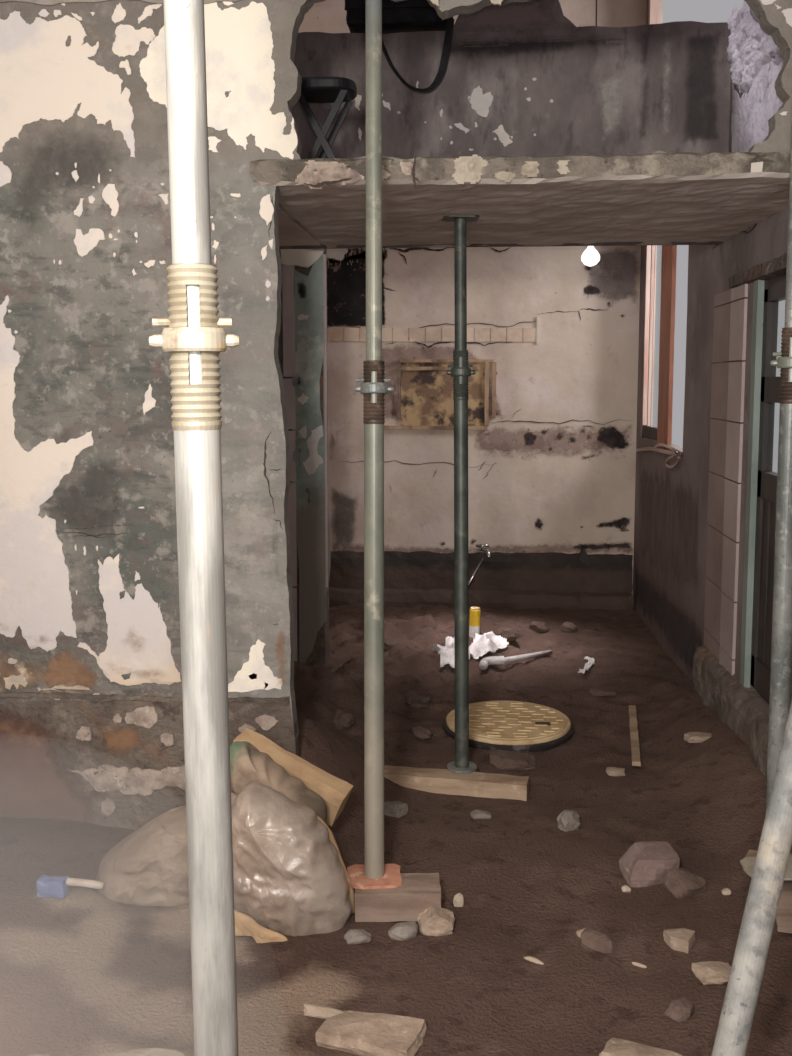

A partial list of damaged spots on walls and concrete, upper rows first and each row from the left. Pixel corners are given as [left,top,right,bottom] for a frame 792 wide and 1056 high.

peeling [0,3,167,187]
peeling [204,1,364,189]
flaking render [726,0,792,152]
water stain [22,145,101,202]
spalling [452,148,539,184]
peeling [74,169,120,257]
peeling [259,194,274,225]
water stain [584,251,637,305]
crack [389,308,607,350]
peeling [0,295,181,686]
peeling [228,639,283,692]
flaking render [66,764,186,815]